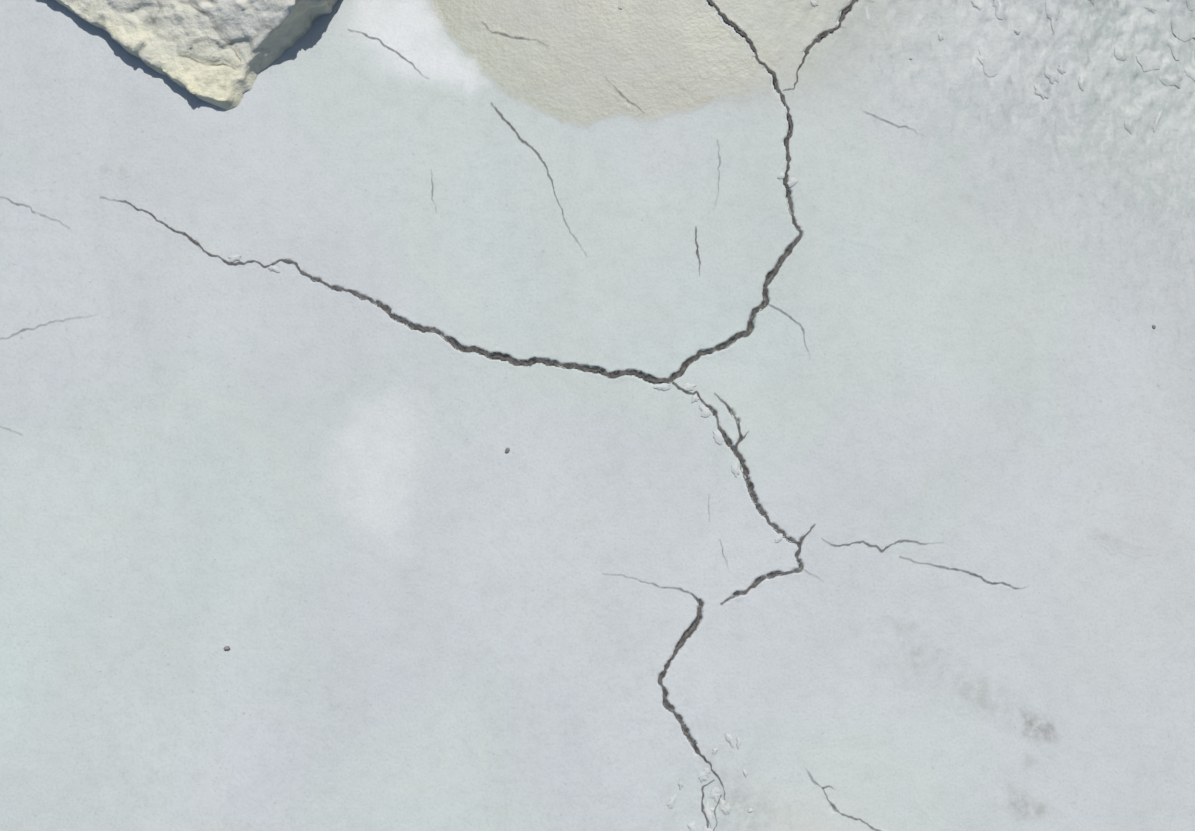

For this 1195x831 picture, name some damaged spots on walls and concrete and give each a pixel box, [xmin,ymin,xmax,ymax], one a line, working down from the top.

water stain [330,0,828,133]
crack [111,0,917,831]
crack [935,565,1016,589]